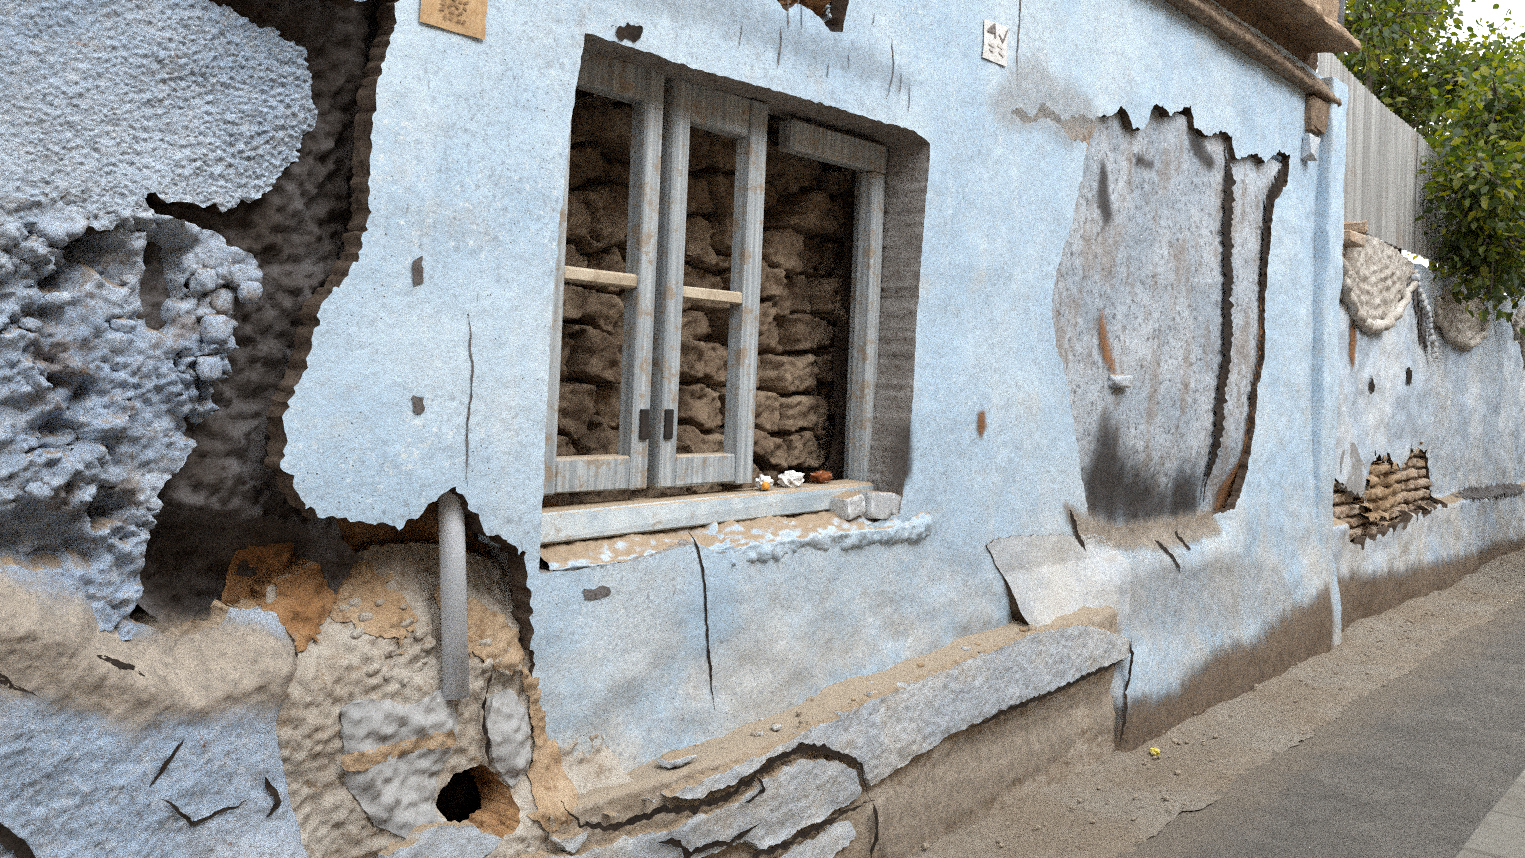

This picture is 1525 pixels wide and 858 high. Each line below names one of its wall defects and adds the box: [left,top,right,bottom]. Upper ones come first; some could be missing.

spalling [777,0,832,26]
crack [136,0,381,626]
spalling [413,256,424,285]
peeling [1011,106,1321,528]
spalling [0,186,263,641]
spalling [412,395,425,414]
flaking render [1332,442,1435,543]
spalling [221,499,1131,858]
crack [561,743,879,858]